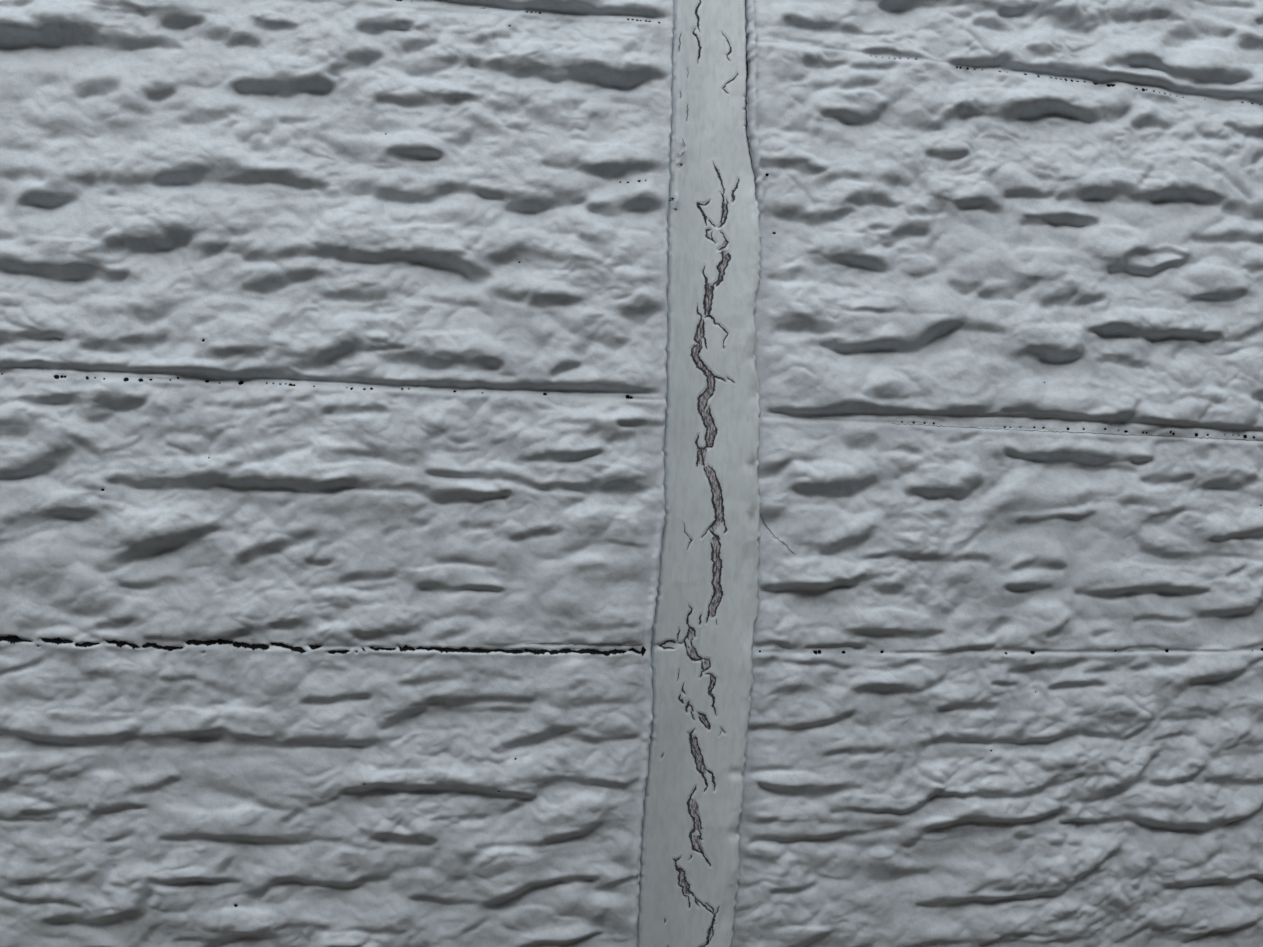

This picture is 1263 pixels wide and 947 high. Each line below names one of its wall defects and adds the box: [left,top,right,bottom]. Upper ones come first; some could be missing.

crack [525,0,757,947]